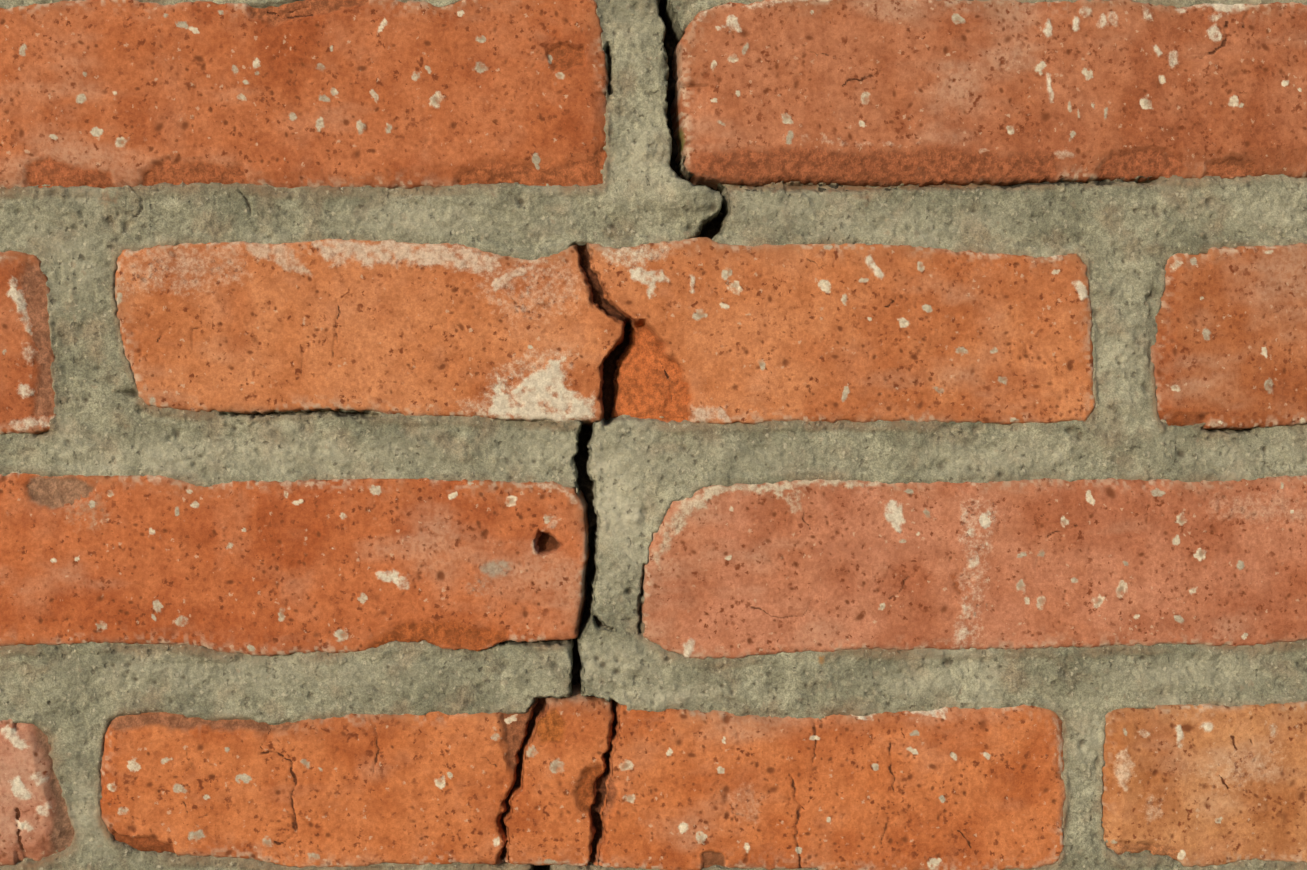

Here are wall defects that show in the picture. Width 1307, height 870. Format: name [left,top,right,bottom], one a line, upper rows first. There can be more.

crack [602,41,615,97]
crack [657,0,768,240]
crack [818,183,848,192]
crack [976,176,1161,190]
crack [474,243,672,870]